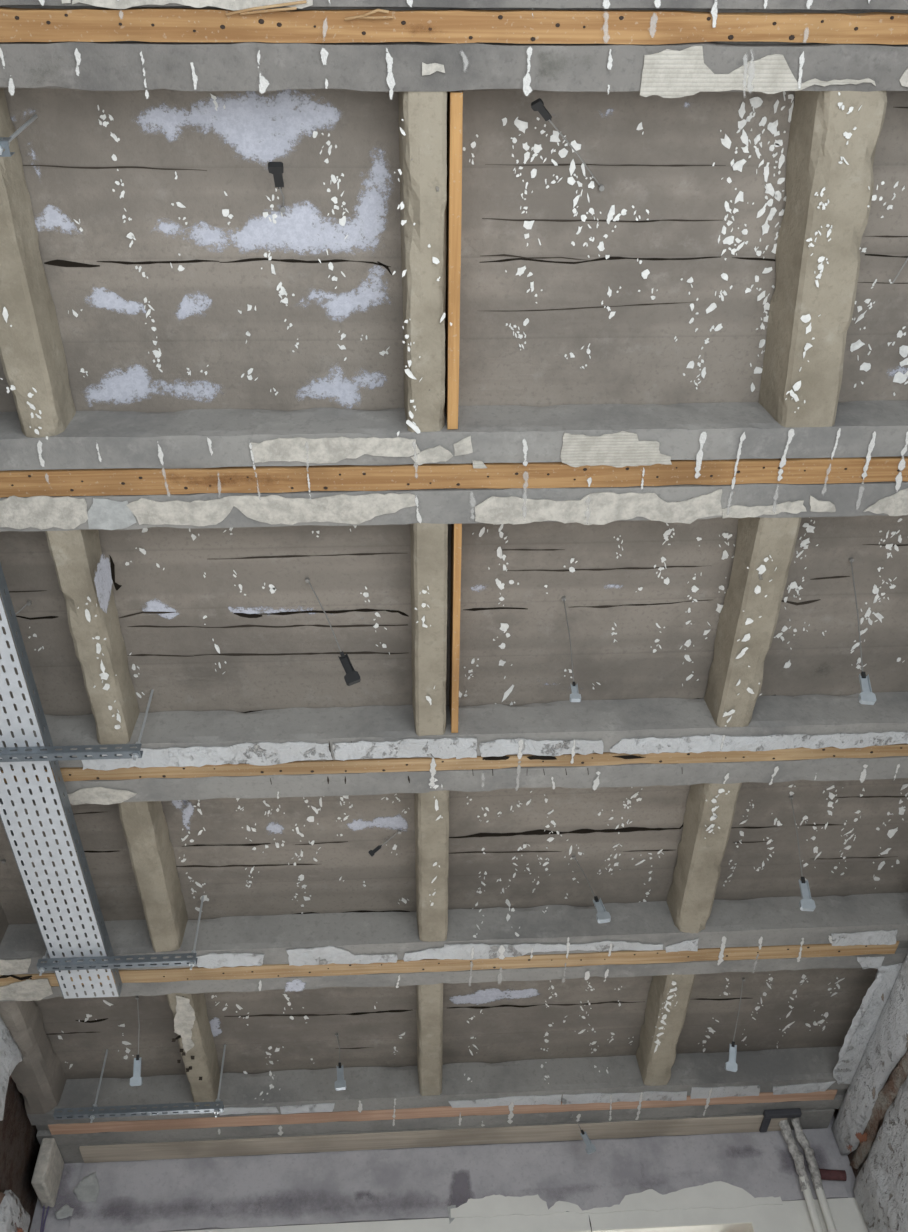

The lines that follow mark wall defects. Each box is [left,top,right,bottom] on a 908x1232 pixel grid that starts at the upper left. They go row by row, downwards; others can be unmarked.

leakage [136,48,339,165]
peeling [838,92,862,165]
leakage [154,148,391,255]
crack [44,258,392,275]
leakage [300,265,390,322]
crack [479,254,776,264]
peeling [806,187,832,288]
leakage [85,365,219,407]
peeling [785,314,821,413]
crack [119,609,409,657]
crack [449,824,683,854]
flaking render [447,1181,783,1223]